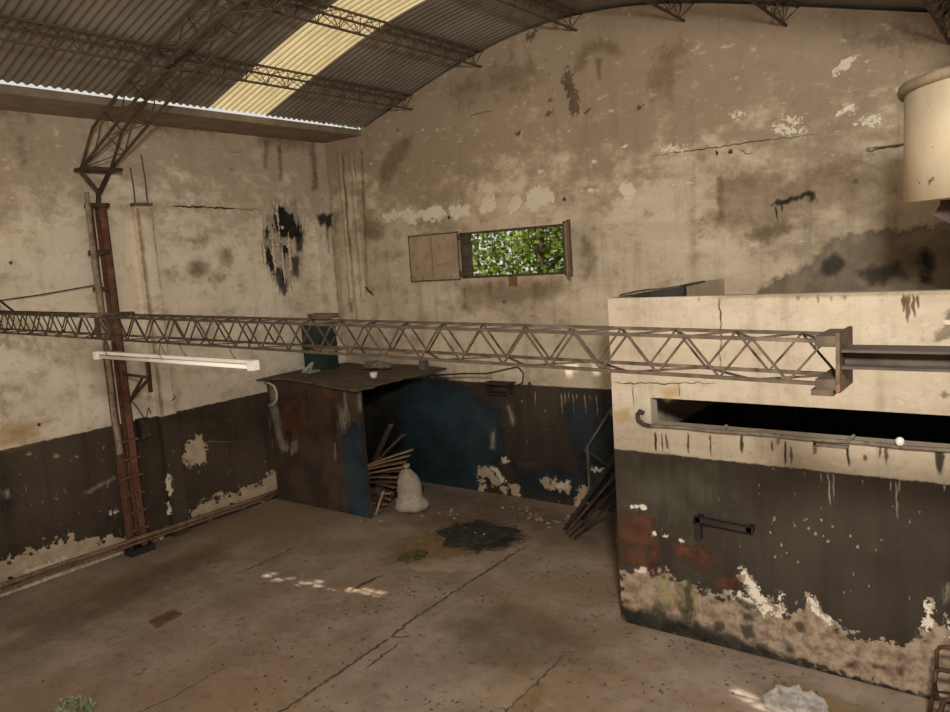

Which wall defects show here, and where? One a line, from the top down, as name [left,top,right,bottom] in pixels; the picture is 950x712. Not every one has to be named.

crack [656,134,812,156]
crack [868,143,904,152]
damp [752,191,815,239]
peeling [261,200,304,295]
peeling [757,221,950,294]
peeling [181,433,218,469]
peeling [189,469,278,522]
peeling [474,456,521,497]
peeling [0,509,126,597]
crack [278,550,520,712]
peeling [619,566,950,698]
crack [505,659,560,712]